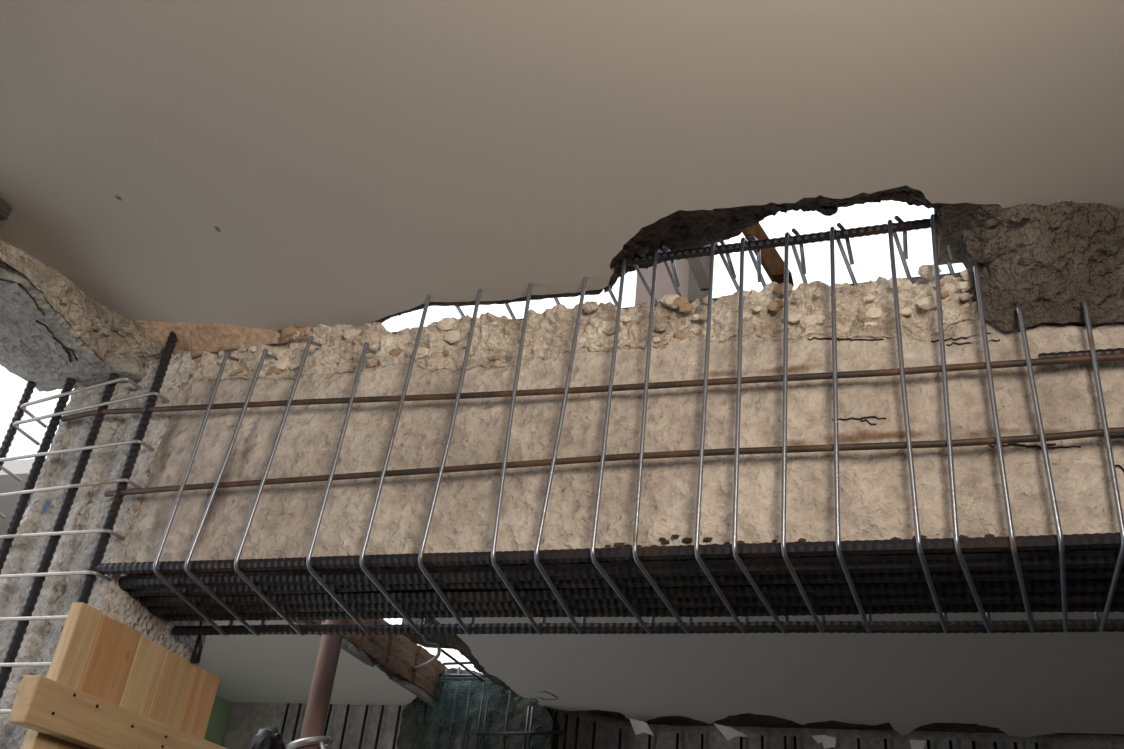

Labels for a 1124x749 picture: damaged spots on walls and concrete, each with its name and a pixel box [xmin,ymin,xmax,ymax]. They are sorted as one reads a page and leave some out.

spalling [0,185,1124,383]
crack [0,259,78,364]
corrosion [839,432,914,441]
spalling [605,534,750,548]
spalling [402,618,579,749]
spalling [281,703,302,742]
spalling [339,704,350,749]
spalling [358,705,402,749]
peeling [618,719,654,749]
peeling [713,723,764,749]
peeling [812,735,836,749]
peeling [910,740,930,749]